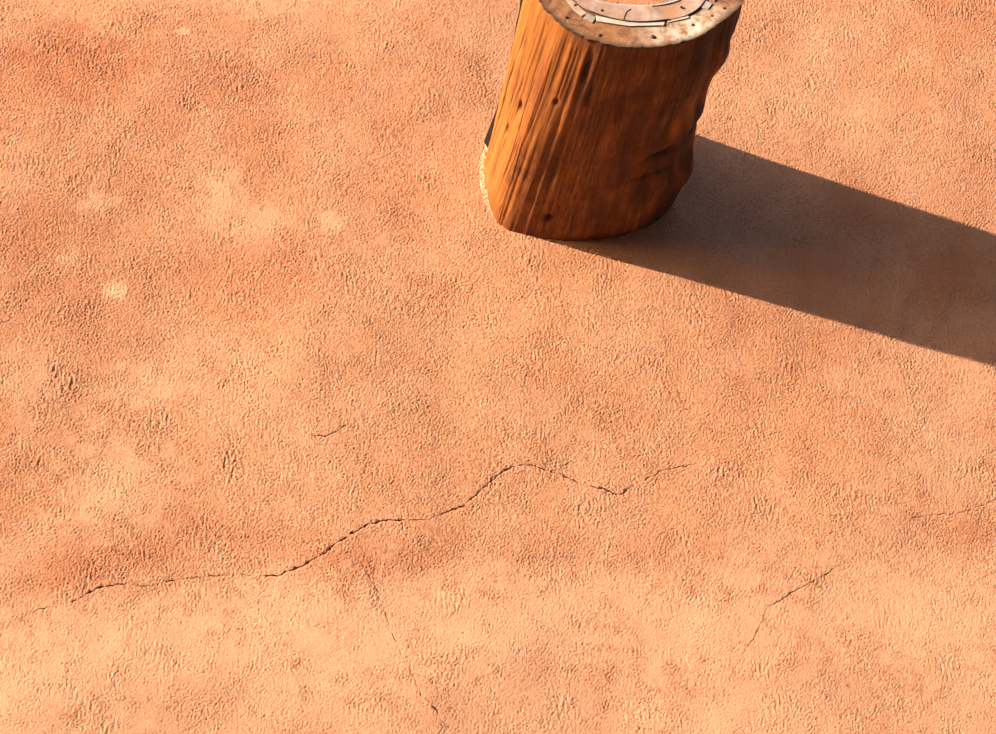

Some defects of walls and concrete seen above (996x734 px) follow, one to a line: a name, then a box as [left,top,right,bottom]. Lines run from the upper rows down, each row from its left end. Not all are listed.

crack [34,459,691,612]